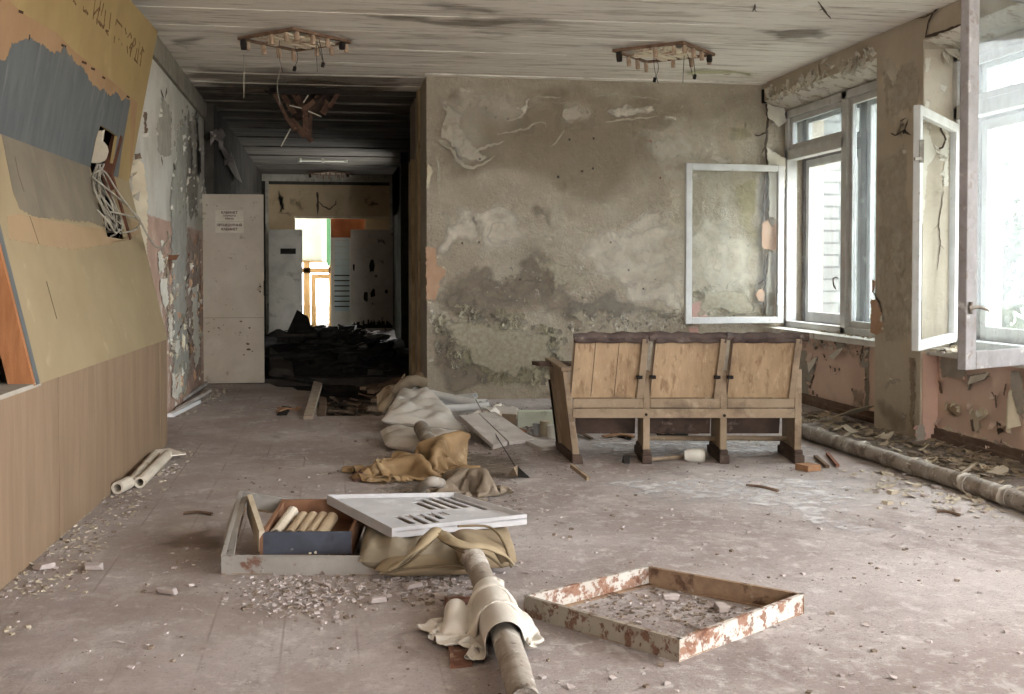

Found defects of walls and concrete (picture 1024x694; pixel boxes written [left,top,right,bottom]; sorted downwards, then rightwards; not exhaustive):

flaking render [438,89,582,169]
flaking render [596,93,675,123]
peeling [761,45,898,127]
peeling [130,89,242,406]
peeling [425,247,447,323]
damp [440,207,679,318]
peeling [747,147,787,317]
crack [936,191,944,268]
peeling [799,339,870,410]
peeling [909,357,1024,463]